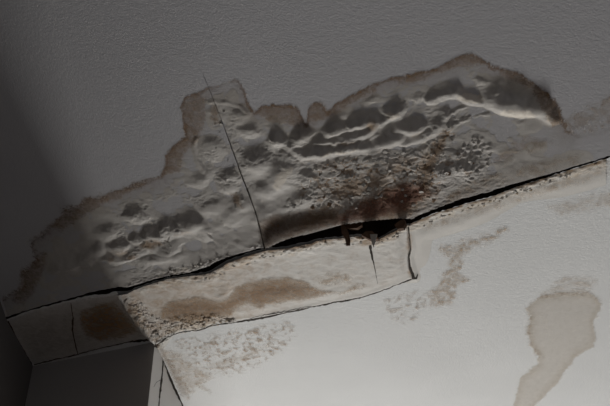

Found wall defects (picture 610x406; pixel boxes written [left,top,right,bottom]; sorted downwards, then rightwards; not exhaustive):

damp [374,54,505,87]
damp [244,88,367,127]
crack [6,75,610,365]
peeling [104,123,607,350]
damp [162,277,336,322]
crack [154,358,183,406]